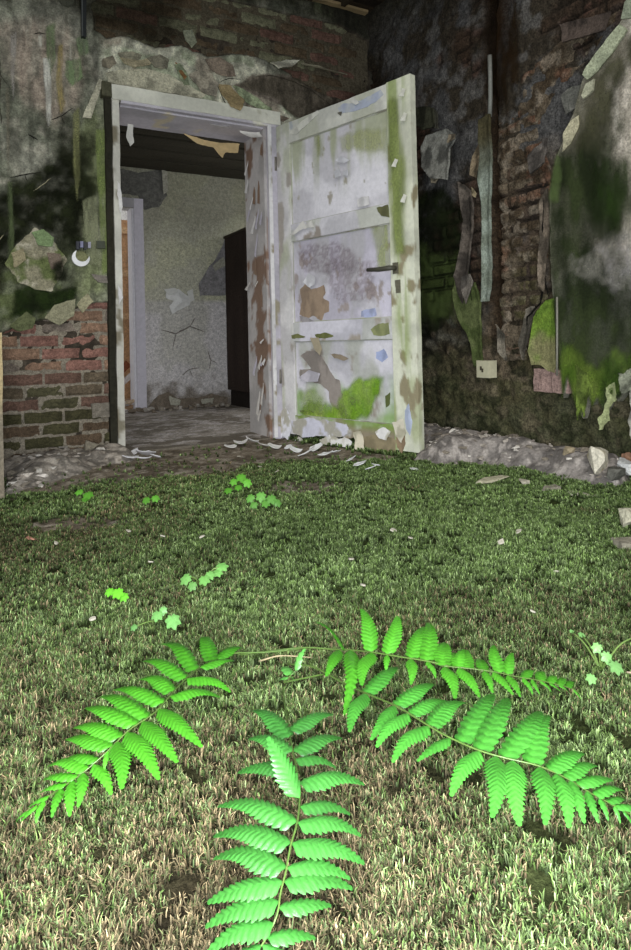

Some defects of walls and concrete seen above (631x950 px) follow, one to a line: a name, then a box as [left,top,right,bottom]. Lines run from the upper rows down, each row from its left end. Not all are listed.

spalling [82,0,384,135]
peeling [183,131,262,158]
peeling [5,228,67,292]
damp [13,261,76,316]
damp [0,129,107,288]
spalling [2,293,110,460]
peeling [244,163,263,307]
peeling [299,273,329,322]
peeling [280,332,412,454]
peeling [357,196,390,217]
peeling [361,308,390,336]
spalling [400,0,631,437]